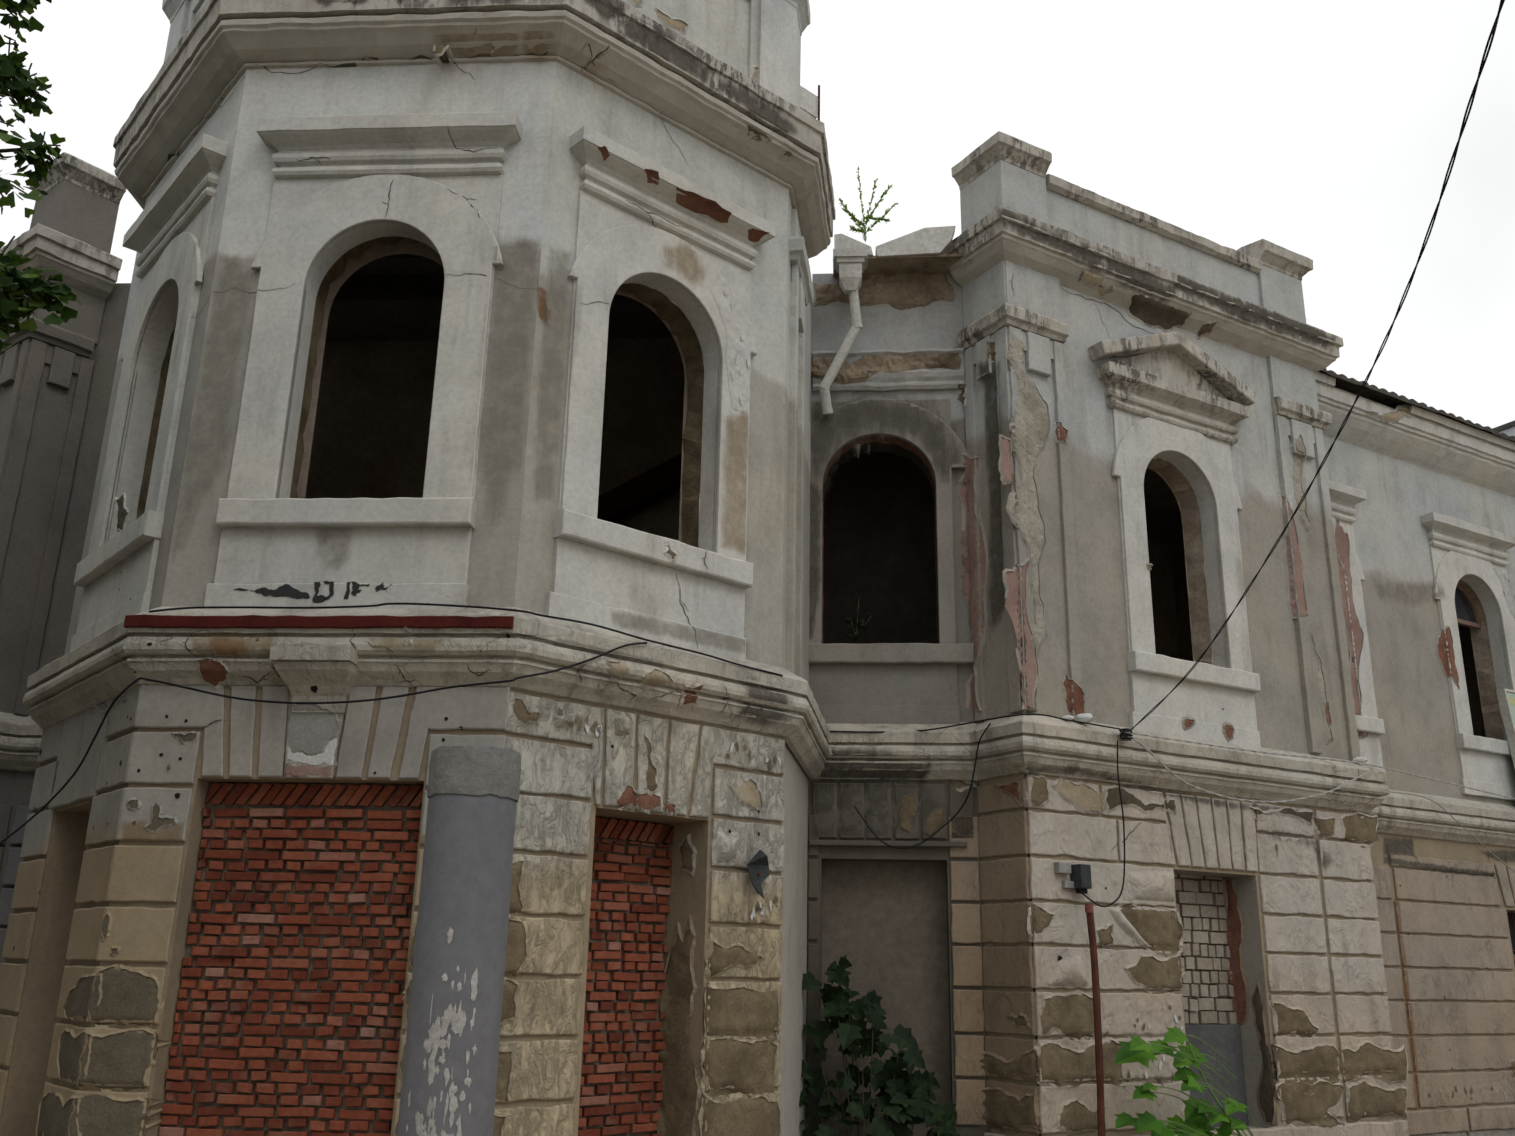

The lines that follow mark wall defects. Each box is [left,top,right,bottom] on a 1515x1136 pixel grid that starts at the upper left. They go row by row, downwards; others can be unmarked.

peeling [628,0,688,35]
flaking render [645,169,732,223]
flaking render [748,227,769,242]
spalling [1078,270,1218,340]
peeling [958,333,1068,713]
flaking render [1061,670,1085,715]
flaking render [1436,626,1460,690]
peeling [285,700,344,779]
spalling [500,856,529,1028]
peeling [393,919,478,1136]
spalling [1221,877,1408,1128]
spalling [493,1046,515,1136]